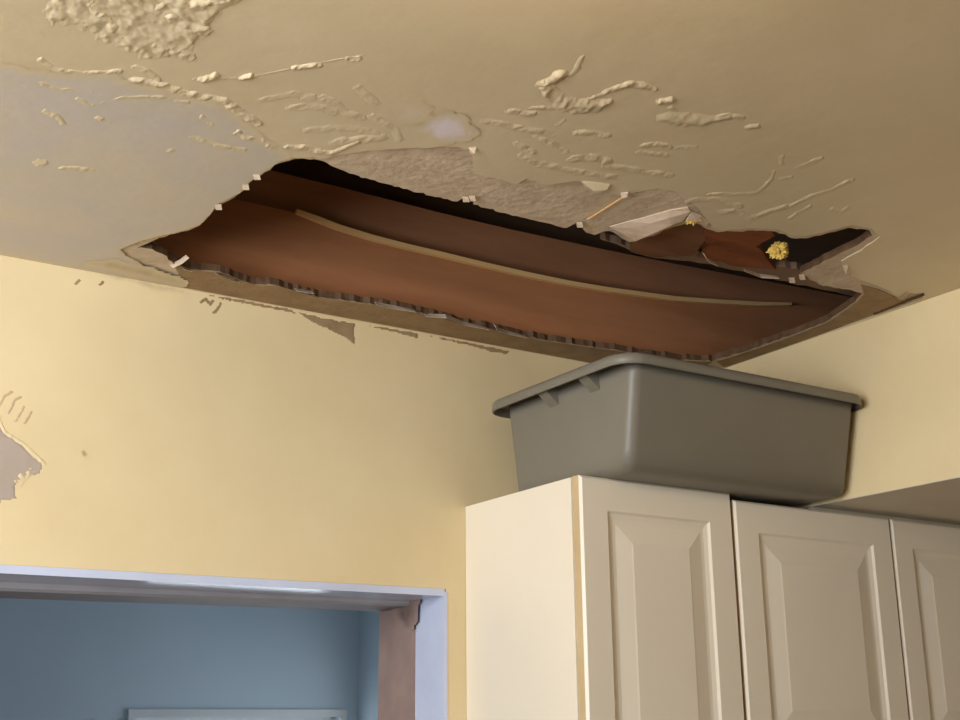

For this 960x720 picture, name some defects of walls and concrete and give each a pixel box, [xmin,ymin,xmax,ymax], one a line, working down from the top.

peeling [0,62,923,368]
peeling [0,391,48,503]